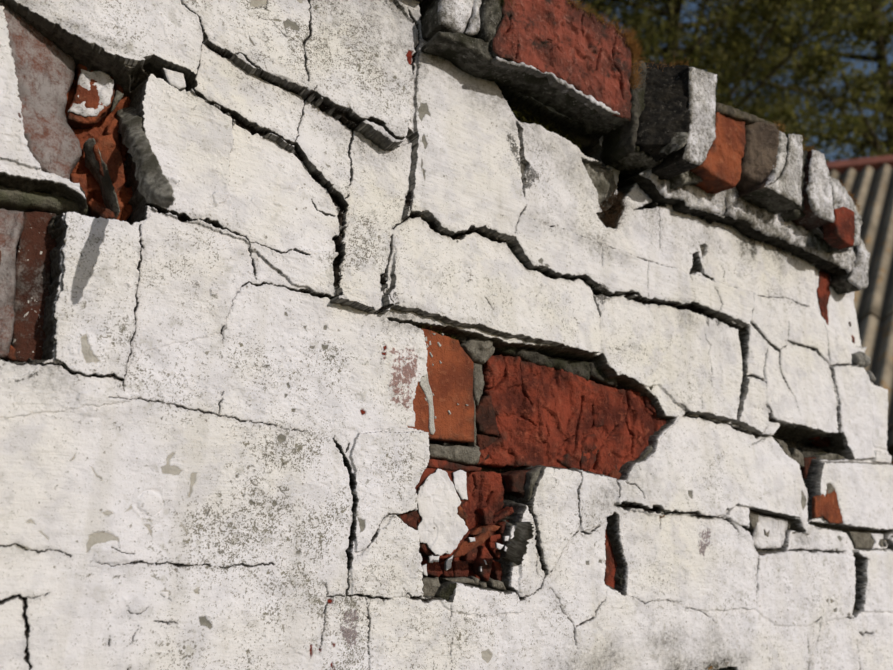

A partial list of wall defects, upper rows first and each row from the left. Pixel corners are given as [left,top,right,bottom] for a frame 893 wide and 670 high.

spalling [161,67,186,91]
spalling [0,1,175,363]
crack [193,1,401,301]
crack [374,190,511,314]
crack [524,266,776,357]
spalling [817,269,831,325]
crack [11,362,295,431]
crack [334,442,376,568]
spalling [397,328,666,601]
crack [617,483,746,529]
spalling [801,483,843,524]
crack [0,595,31,669]